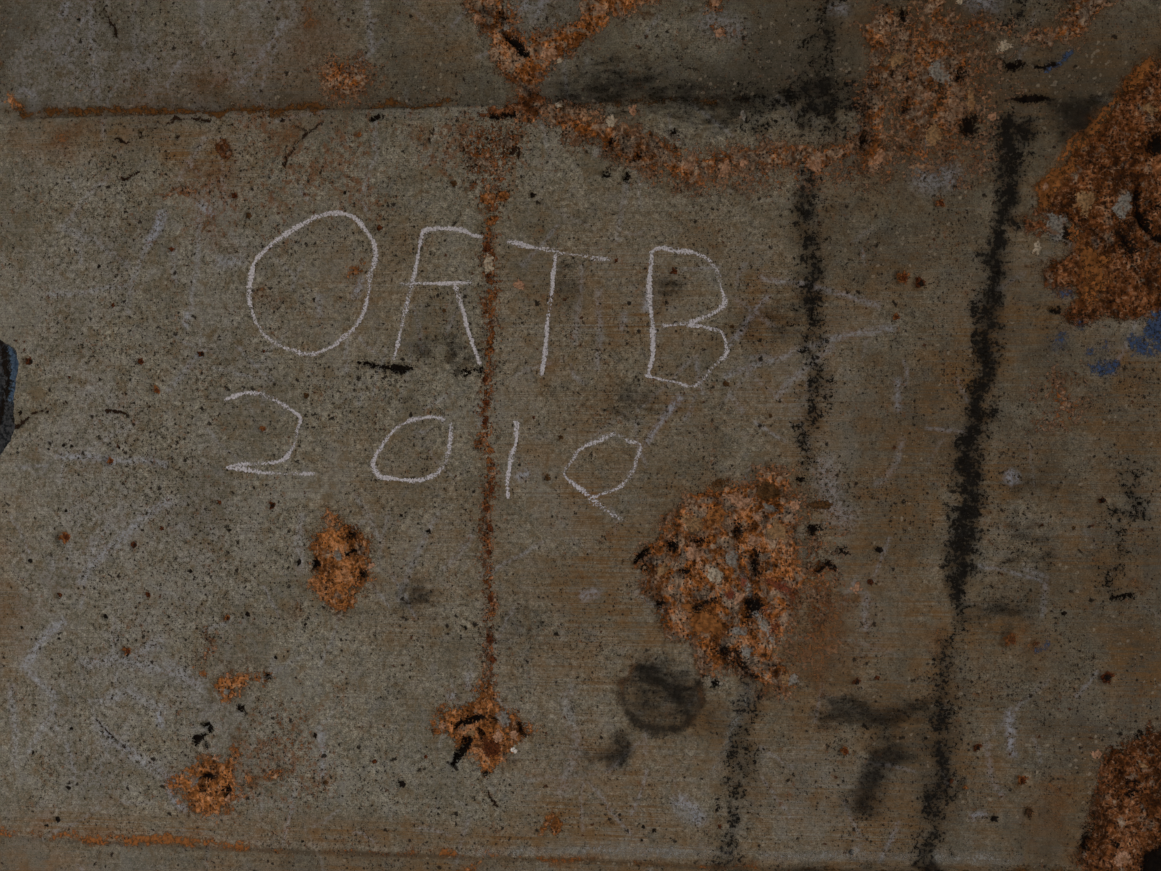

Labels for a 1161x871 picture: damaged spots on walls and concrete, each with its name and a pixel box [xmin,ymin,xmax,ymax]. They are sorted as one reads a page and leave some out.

rust [477,90,749,119]
water stain [550,0,885,155]
water stain [761,163,837,472]
water stain [811,82,1126,871]
rust [306,503,382,621]
rust [0,710,316,853]
rust [426,676,539,779]
water stain [581,652,770,871]